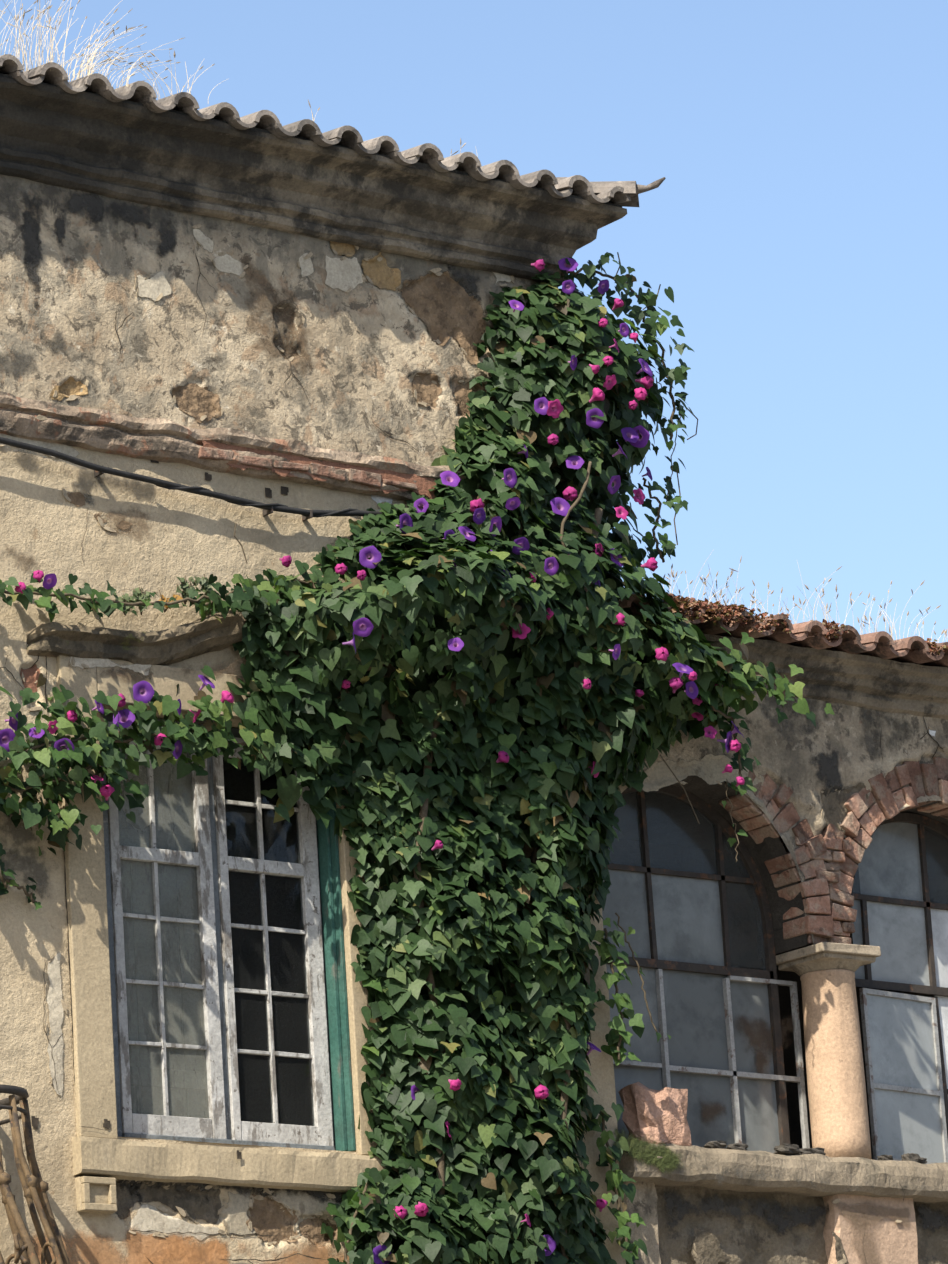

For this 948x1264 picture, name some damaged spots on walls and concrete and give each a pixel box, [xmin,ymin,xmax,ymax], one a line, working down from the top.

leakage [1,185,177,307]
flaking render [273,300,305,362]
flaking render [297,241,486,365]
flaking render [171,383,223,423]
flaking render [412,373,494,416]
peeling [45,952,67,1097]
flaking render [29,1180,349,1264]
crack [132,1230,326,1264]